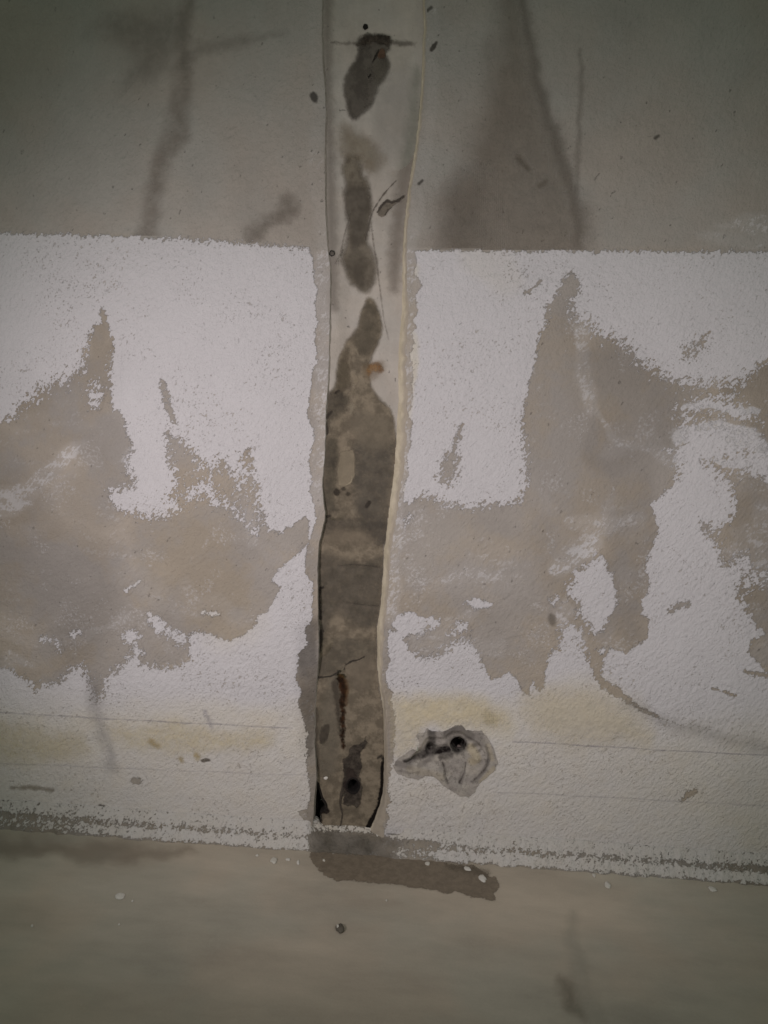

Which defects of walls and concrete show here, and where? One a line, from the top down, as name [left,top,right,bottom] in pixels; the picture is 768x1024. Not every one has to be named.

damp [344,35,391,119]
peeling [0,301,311,711]
damp [315,133,396,826]
peeling [289,0,768,838]
corrosion [333,676,348,749]
crack [339,755,400,835]